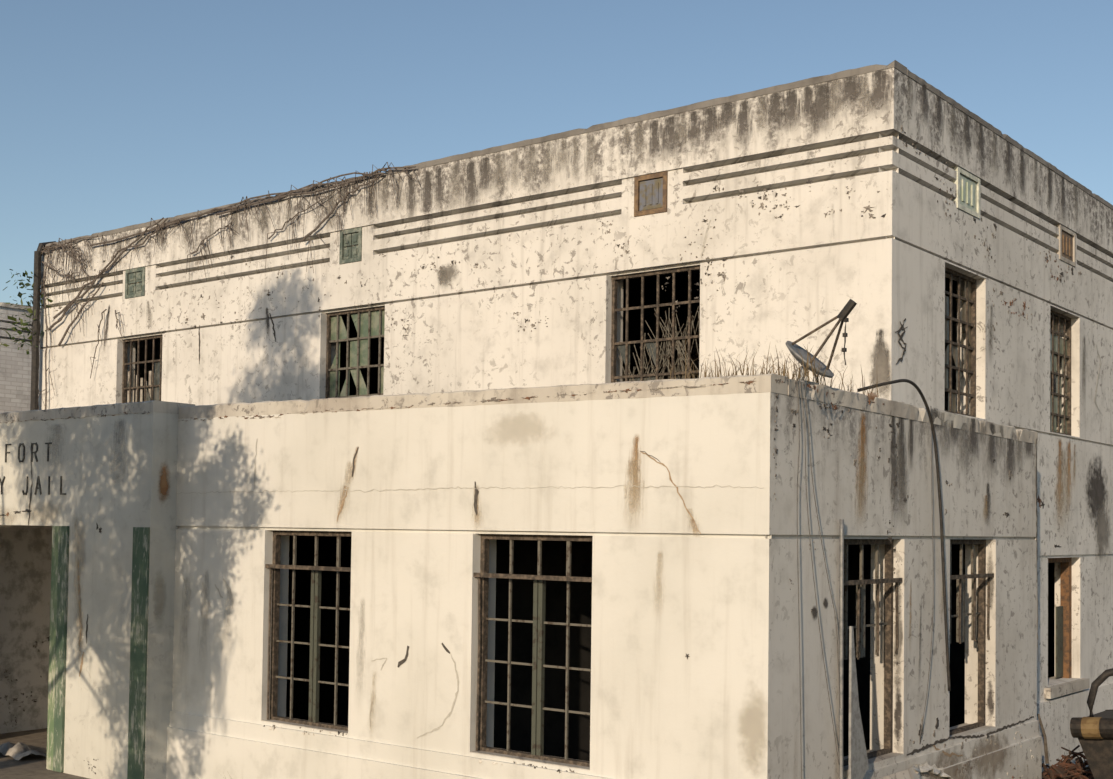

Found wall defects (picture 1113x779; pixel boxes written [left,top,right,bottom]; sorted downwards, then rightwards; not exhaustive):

damp [370,136,594,212]
damp [625,71,890,151]
peeling [738,184,800,219]
damp [909,77,1078,215]
peeling [671,216,727,313]
rust [159,467,169,500]
crack [179,441,761,534]
rust [1058,441,1076,501]
damp [1087,460,1109,556]
peeling [912,728,998,779]